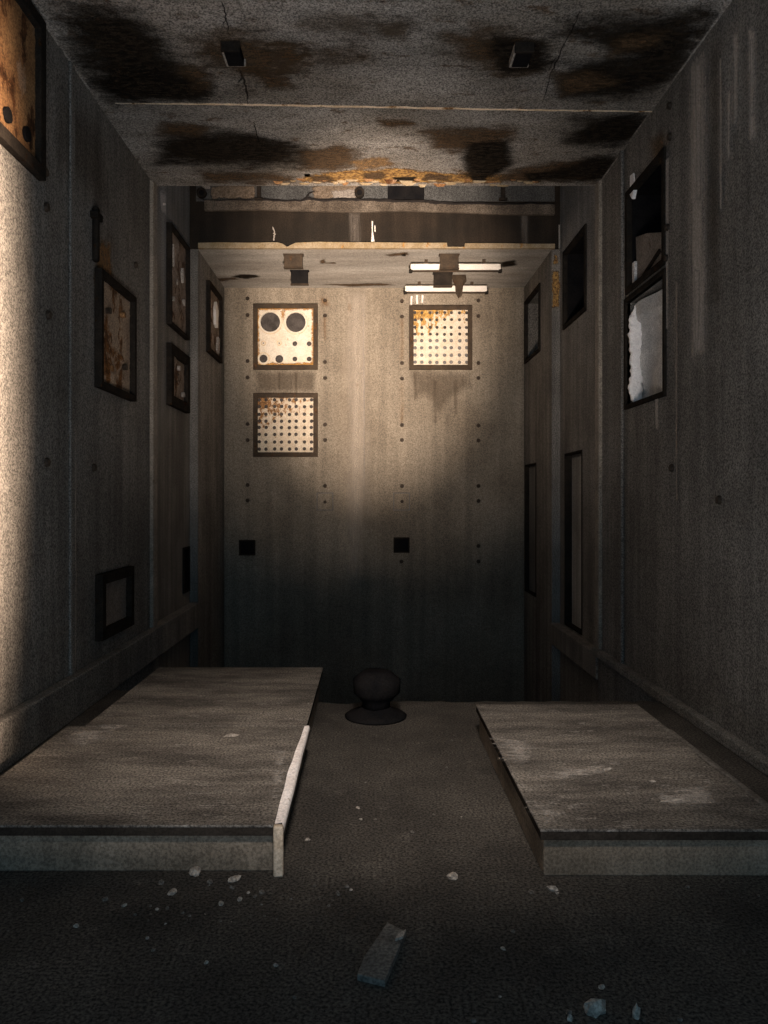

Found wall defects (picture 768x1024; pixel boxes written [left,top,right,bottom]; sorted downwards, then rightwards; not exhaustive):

water stain [59,2,368,108]
crack [238,73,258,136]
water stain [153,122,359,170]
corrosion [199,157,507,184]
water stain [377,113,646,182]
water stain [439,5,719,356]